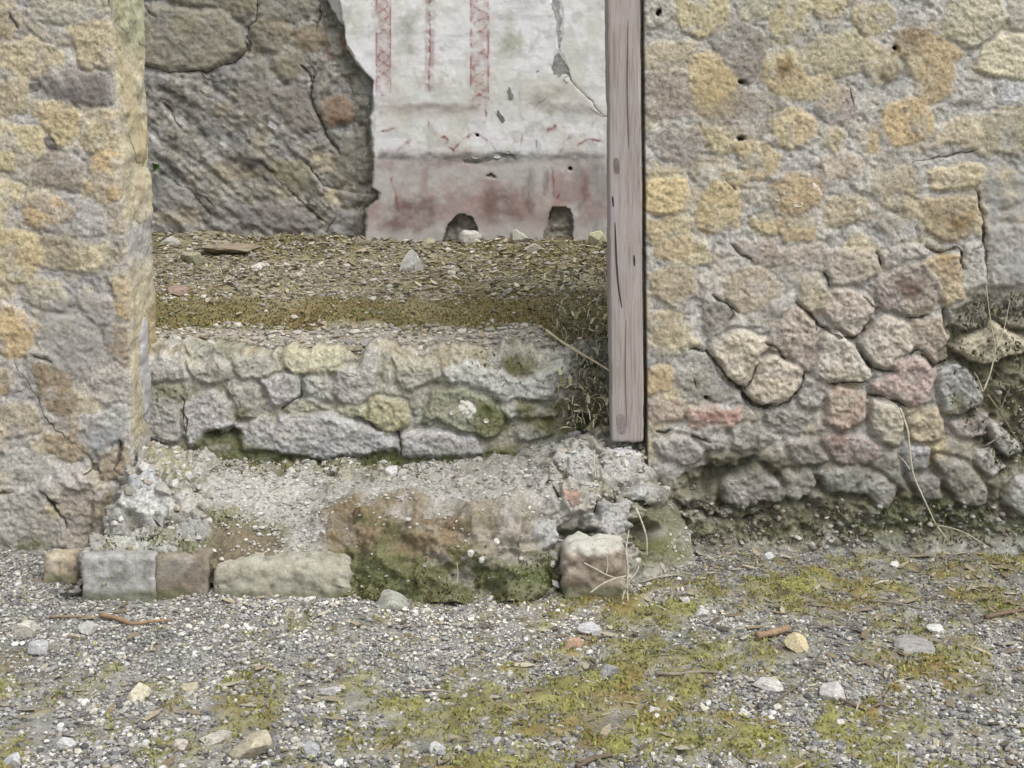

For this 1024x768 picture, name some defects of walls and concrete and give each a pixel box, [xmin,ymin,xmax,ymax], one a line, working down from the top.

flaking render [320,0,370,233]
crack [927,193,988,281]
crack [14,356,122,475]
crack [41,492,68,529]